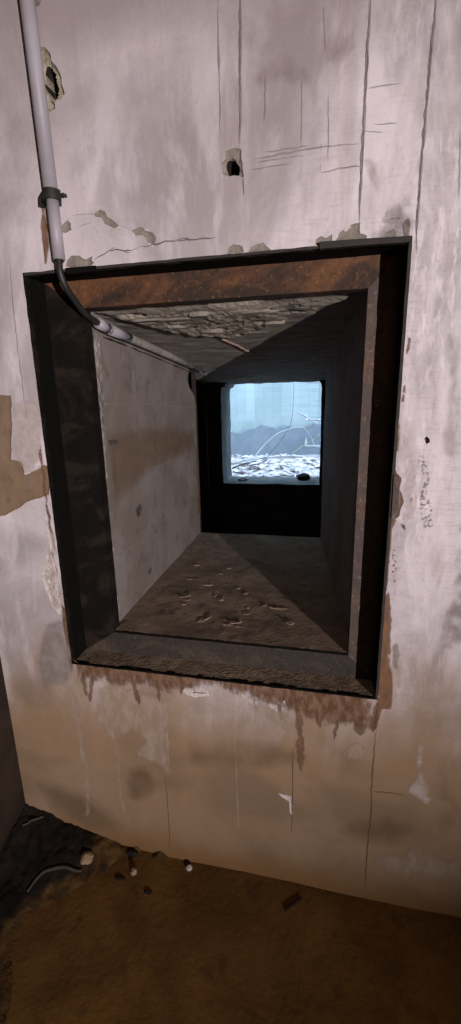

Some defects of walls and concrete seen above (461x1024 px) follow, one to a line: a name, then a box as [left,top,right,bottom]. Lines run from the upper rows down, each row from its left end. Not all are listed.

spalling [41,47,65,112]
spalling [221,148,244,178]
spalling [66,255,94,267]
peeling [91,208,156,247]
crack [95,237,216,259]
spalling [315,223,367,245]
peeling [0,395,50,516]
corrosion [62,520,396,771]